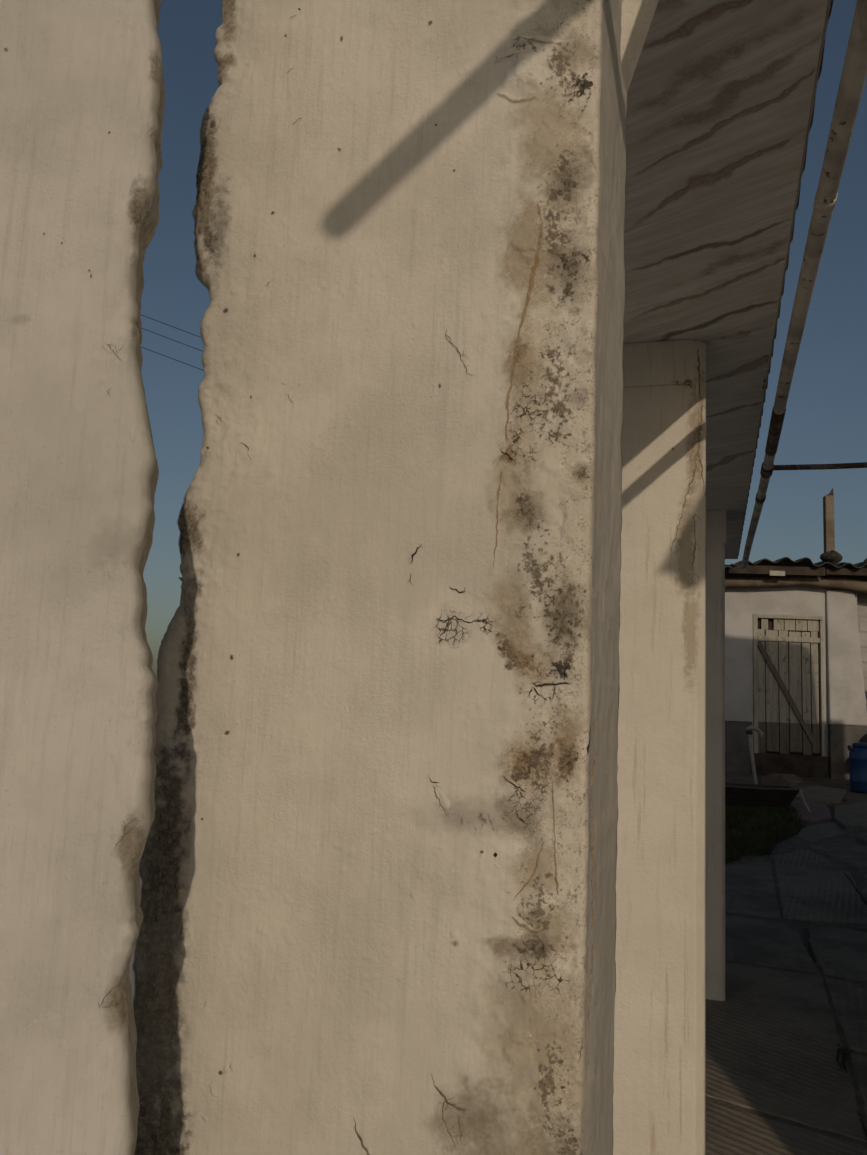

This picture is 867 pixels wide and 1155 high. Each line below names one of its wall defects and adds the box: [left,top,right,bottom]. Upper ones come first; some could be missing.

water stain [540,42,593,111]
water stain [536,146,590,303]
corrosion [505,205,542,441]
water stain [528,340,580,445]
crack [431,586,495,648]
water stain [515,494,586,668]
water stain [516,707,562,811]
water stain [518,866,555,953]
crack [494,954,572,1001]
water stain [534,1042,569,1129]